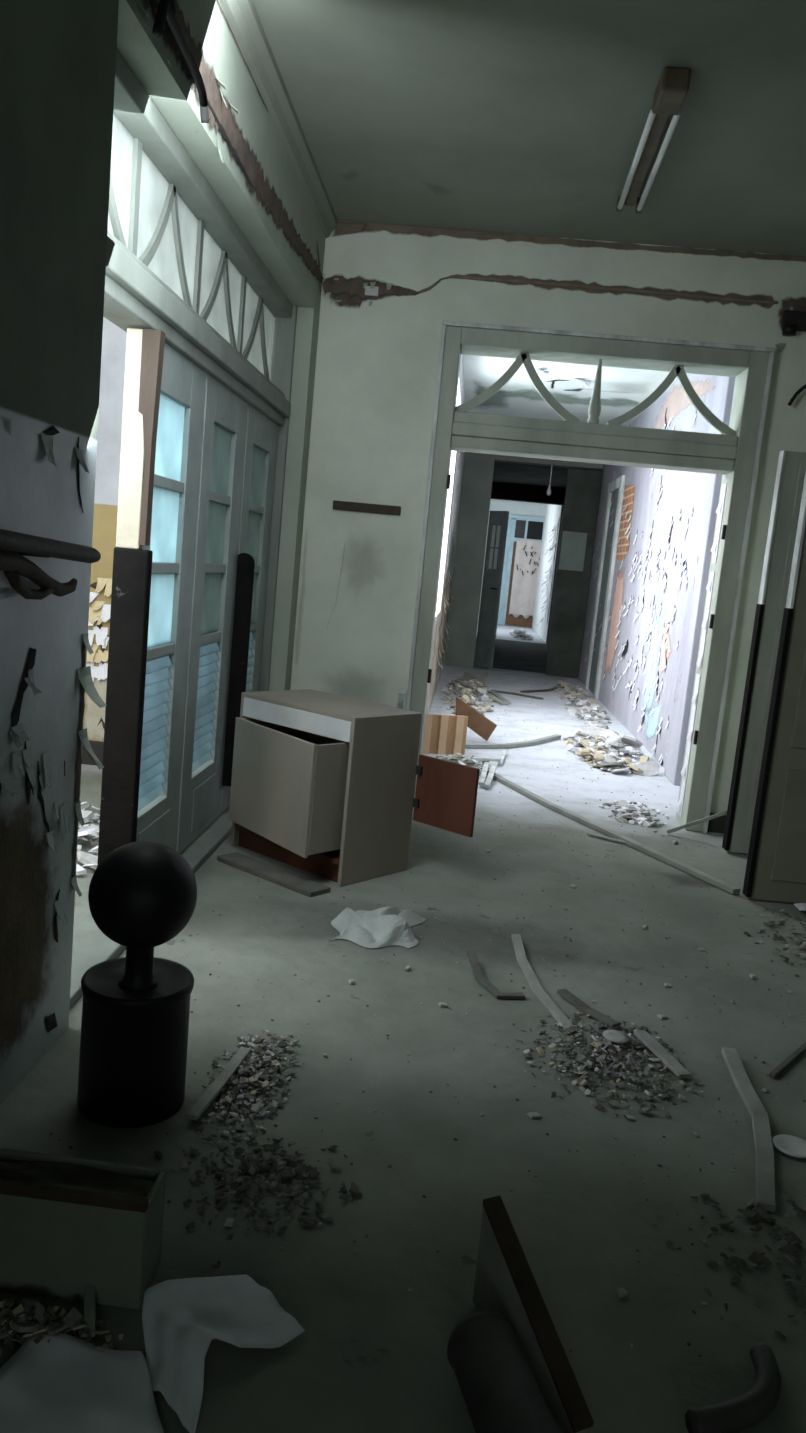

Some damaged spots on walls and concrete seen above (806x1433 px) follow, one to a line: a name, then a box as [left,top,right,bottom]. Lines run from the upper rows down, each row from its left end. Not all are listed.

spalling [136,0,806,326]
peeling [0,578,112,1054]
peeling [584,484,693,739]
peeling [676,483,727,817]